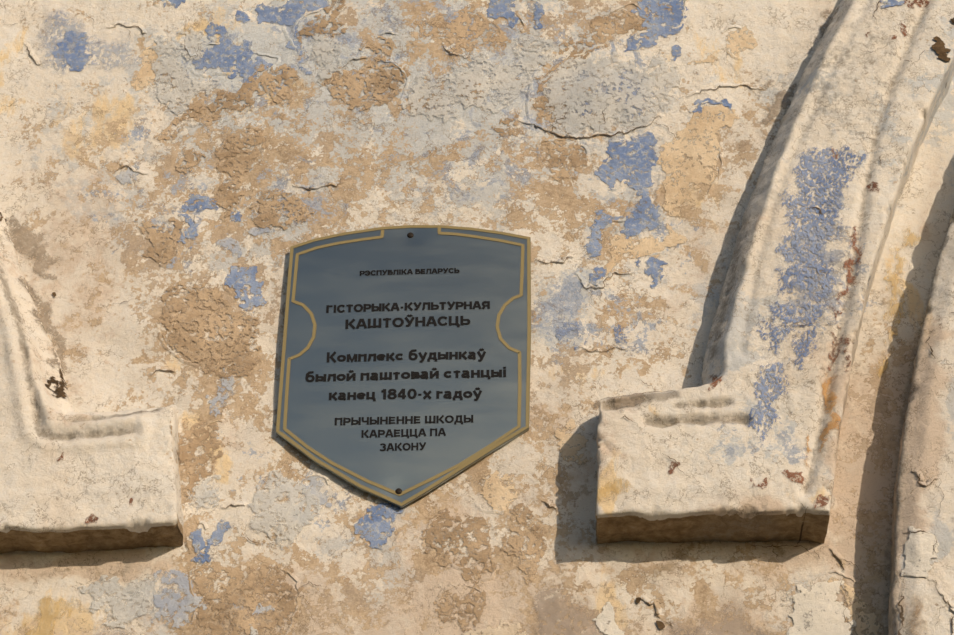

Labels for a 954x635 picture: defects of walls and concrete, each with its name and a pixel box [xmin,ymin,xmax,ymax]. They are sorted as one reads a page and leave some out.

peeling [46,0,762,288]
crack [513,82,766,139]
peeling [745,145,866,440]
flaking render [78,237,304,635]
peeling [248,470,337,550]
corrosion [782,470,804,484]
crack [903,469,946,553]
flaking render [420,470,547,635]
crack [638,595,673,628]
peeling [781,569,883,635]
crack [894,569,908,635]
crack [928,576,954,635]